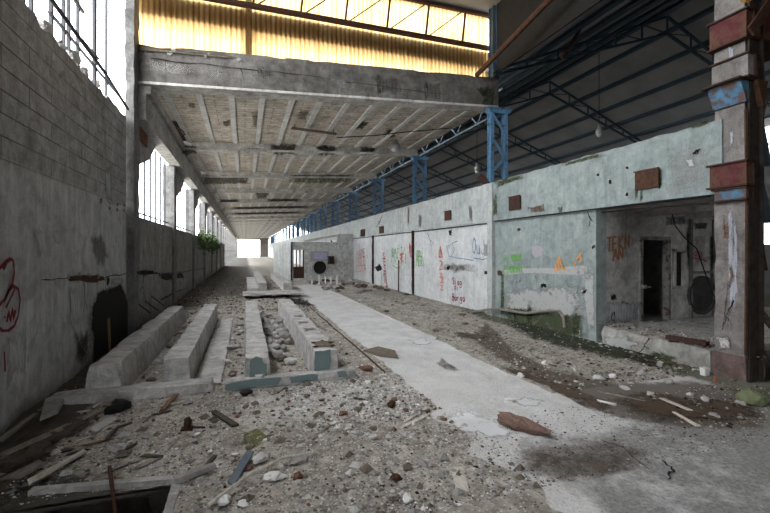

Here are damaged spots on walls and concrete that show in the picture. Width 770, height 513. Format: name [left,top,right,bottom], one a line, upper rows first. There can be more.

peeling [500,265,594,330]
peeling [728,217,737,300]